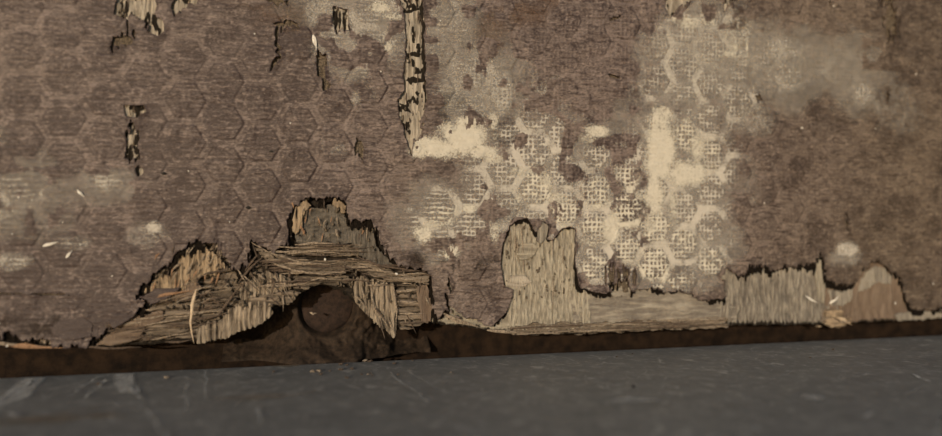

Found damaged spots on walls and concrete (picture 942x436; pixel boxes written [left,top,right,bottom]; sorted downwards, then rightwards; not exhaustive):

peeling [114,0,164,36]
peeling [171,0,198,14]
peeling [397,0,427,154]
crack [124,105,146,177]
damp [407,1,810,291]
damp [95,174,119,189]
peeling [292,199,311,235]
crack [149,198,574,334]
crack [595,265,641,298]
peeling [494,218,942,336]
peeling [416,284,432,323]
peeling [0,331,77,349]